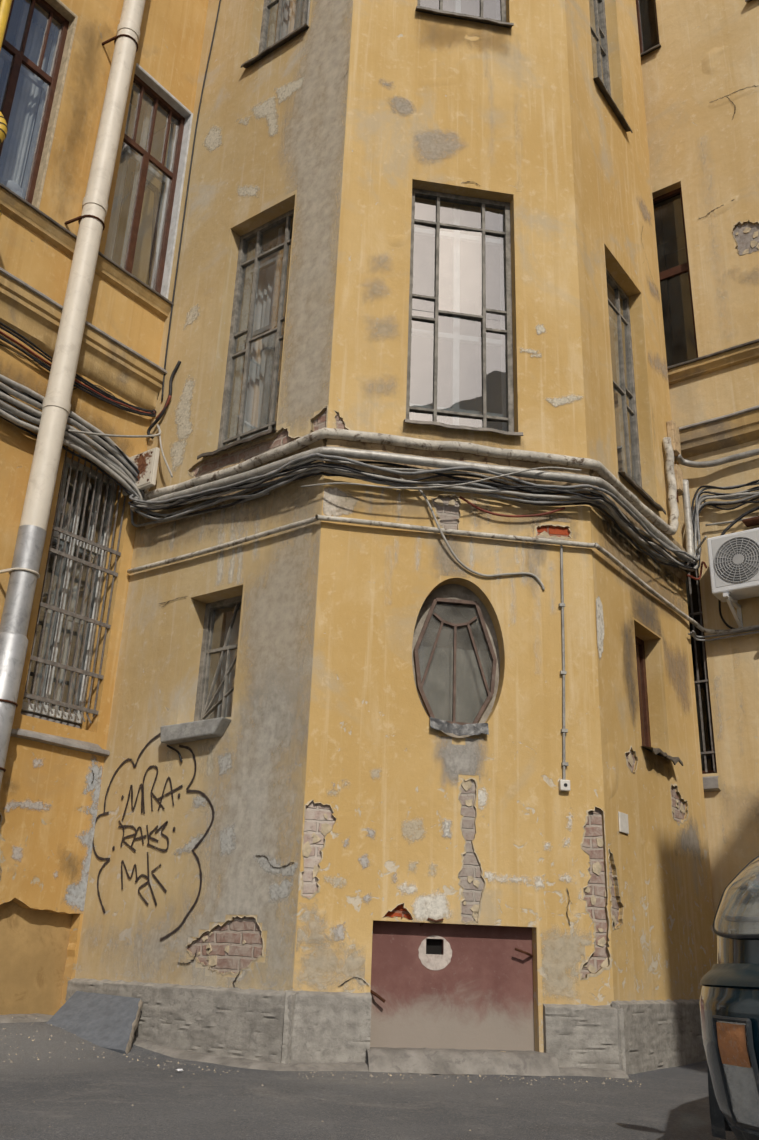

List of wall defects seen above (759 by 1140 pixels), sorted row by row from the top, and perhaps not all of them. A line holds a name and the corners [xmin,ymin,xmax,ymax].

peeling [239,77,305,136]
flaking render [732,220,759,256]
flaking render [170,379,350,478]
flaking render [625,746,638,774]
peeling [0,800,51,829]
flaking render [258,783,347,902]
flaking render [383,777,544,925]
flaking render [670,783,689,827]
flaking render [565,806,624,980]
flaking render [184,915,265,976]